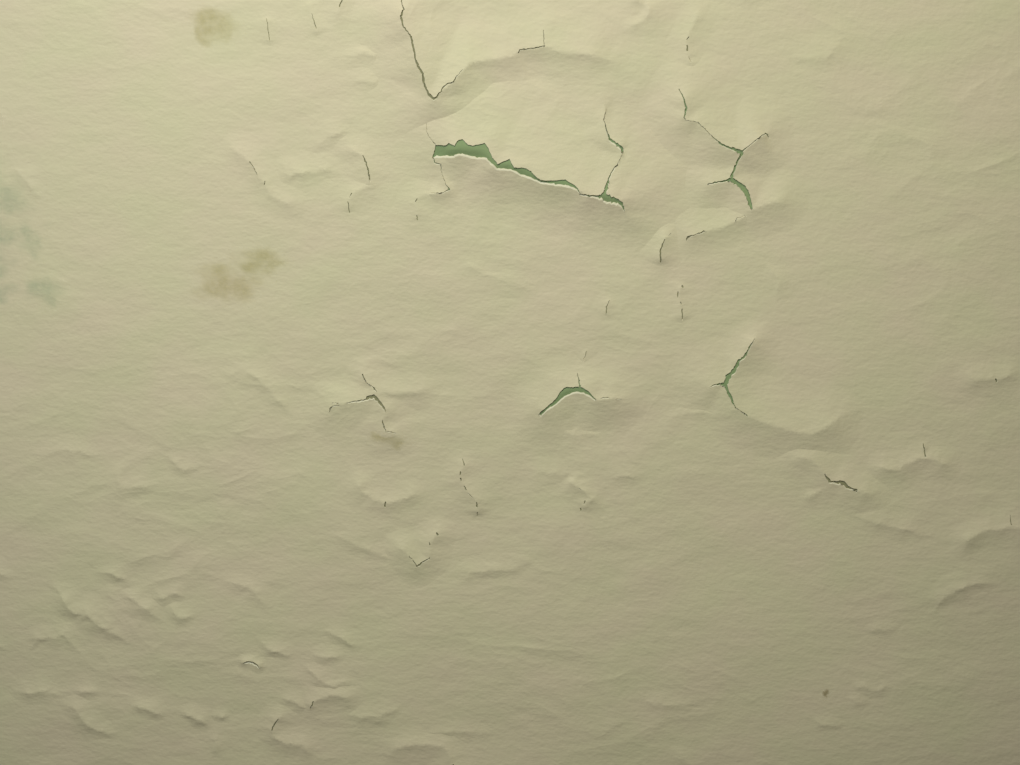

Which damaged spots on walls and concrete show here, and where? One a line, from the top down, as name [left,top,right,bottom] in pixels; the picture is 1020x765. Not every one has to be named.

peeling [389,79,690,251]
crack [639,50,810,273]
crack [304,352,441,462]
crack [508,351,650,447]